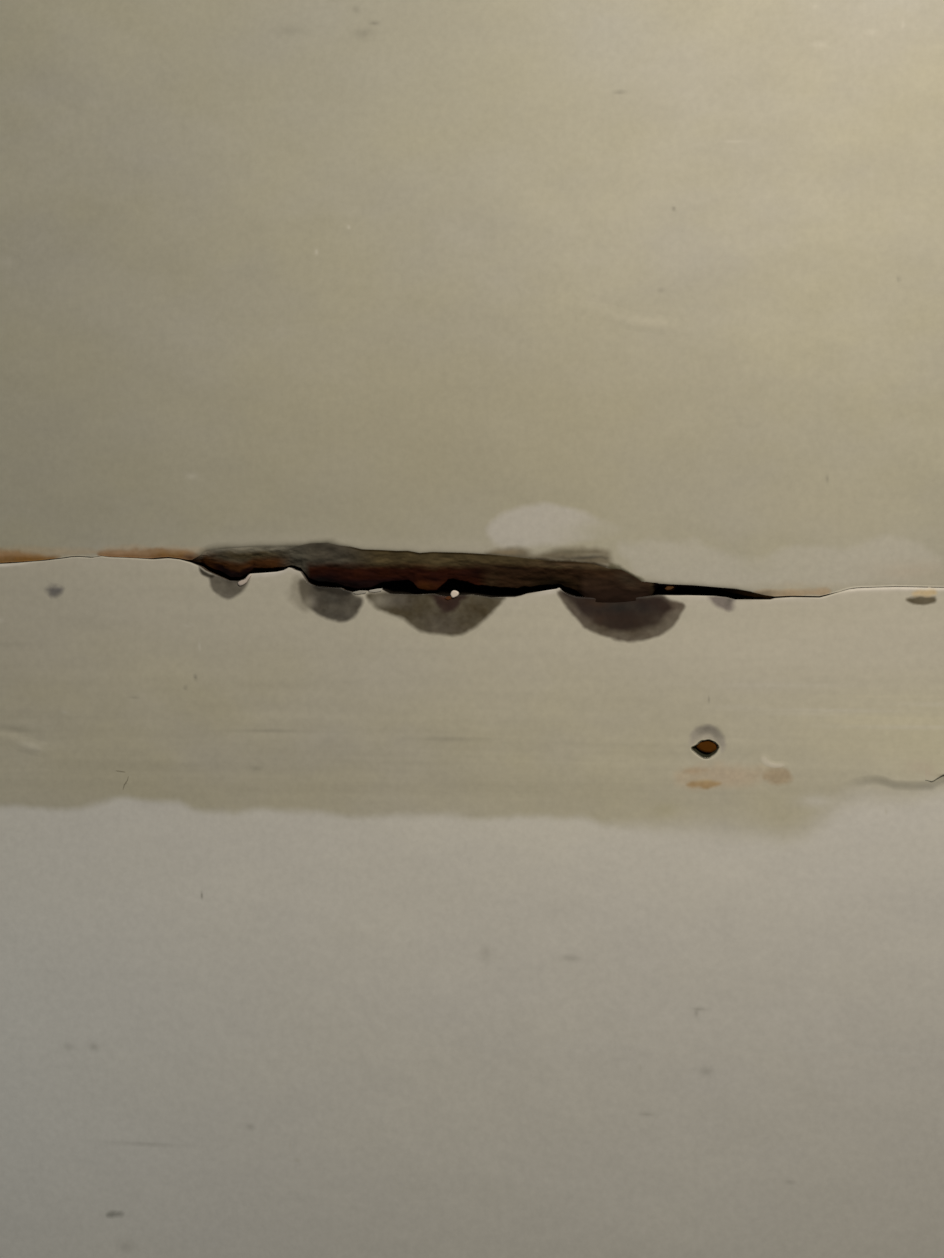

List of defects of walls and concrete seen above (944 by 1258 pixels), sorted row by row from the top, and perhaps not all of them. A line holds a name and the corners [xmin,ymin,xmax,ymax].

rust [0,543,202,563]
water stain [283,573,508,638]
crack [0,543,851,603]
water stain [482,544,687,644]